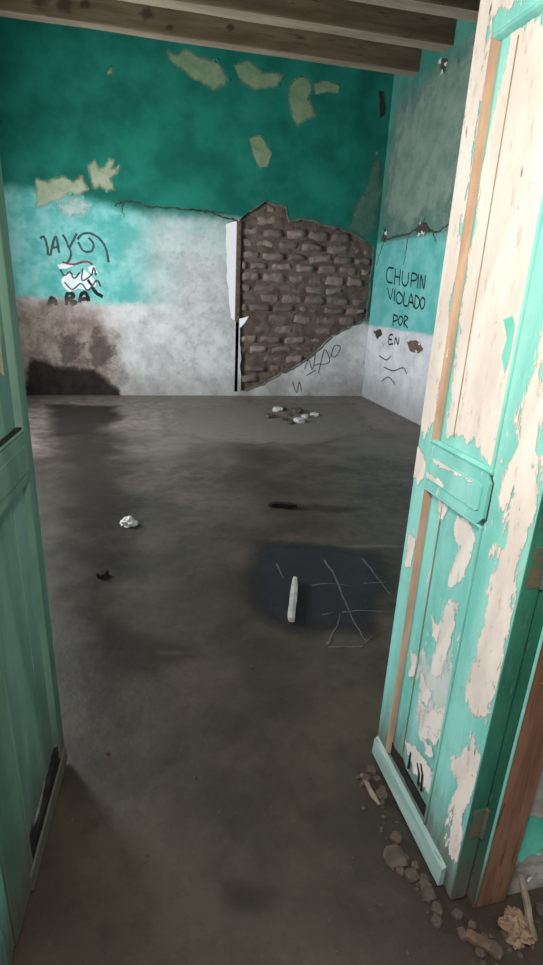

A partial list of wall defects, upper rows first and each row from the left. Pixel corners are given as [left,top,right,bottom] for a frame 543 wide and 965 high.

peeling [169,50,340,126]
peeling [36,159,120,207]
crack [114,200,237,221]
crack [376,222,449,266]
leakage [17,303,124,382]
peeling [239,0,543,726]
peeling [405,499,476,795]
peeling [444,731,481,863]